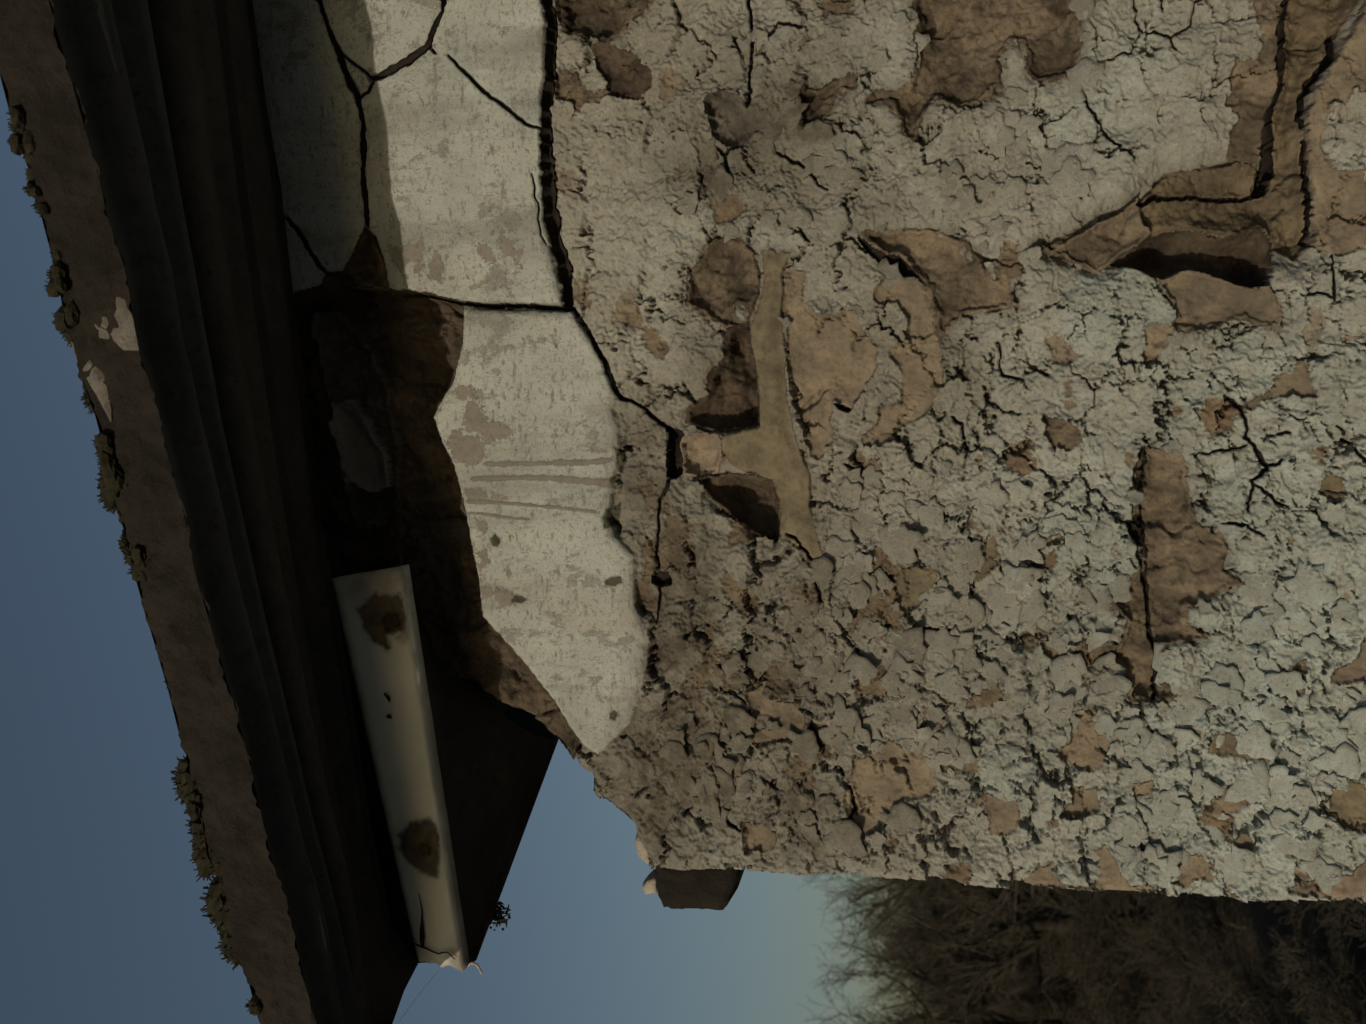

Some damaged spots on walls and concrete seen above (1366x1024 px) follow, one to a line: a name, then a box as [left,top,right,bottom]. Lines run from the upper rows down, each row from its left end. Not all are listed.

spalling [554,0,659,122]
crack [747,0,801,108]
crack [1107,0,1199,61]
crack [1080,86,1135,159]
crack [1137,0,1339,303]
crack [285,217,332,276]
crack [316,0,677,623]
spalling [294,227,582,760]
peeling [658,0,1366,901]
rust [357,593,405,650]
crack [1127,448,1158,701]
rust [397,820,440,878]